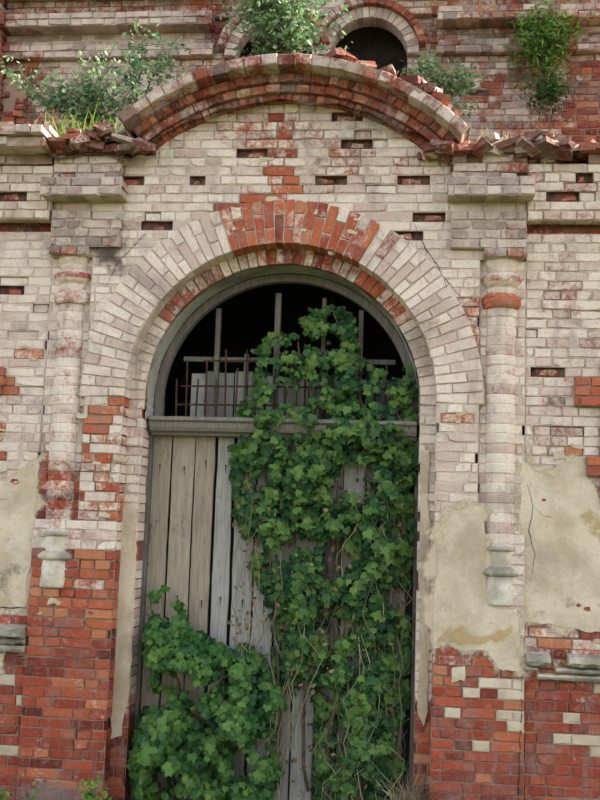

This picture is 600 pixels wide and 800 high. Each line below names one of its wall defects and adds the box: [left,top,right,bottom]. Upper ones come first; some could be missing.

peeling [2,377,19,395]
flaking render [0,397,139,739]
flaking render [417,443,600,726]
flaking render [497,710,523,732]
flaking render [0,745,19,755]
flaking render [473,740,489,751]
flaking render [553,733,600,757]